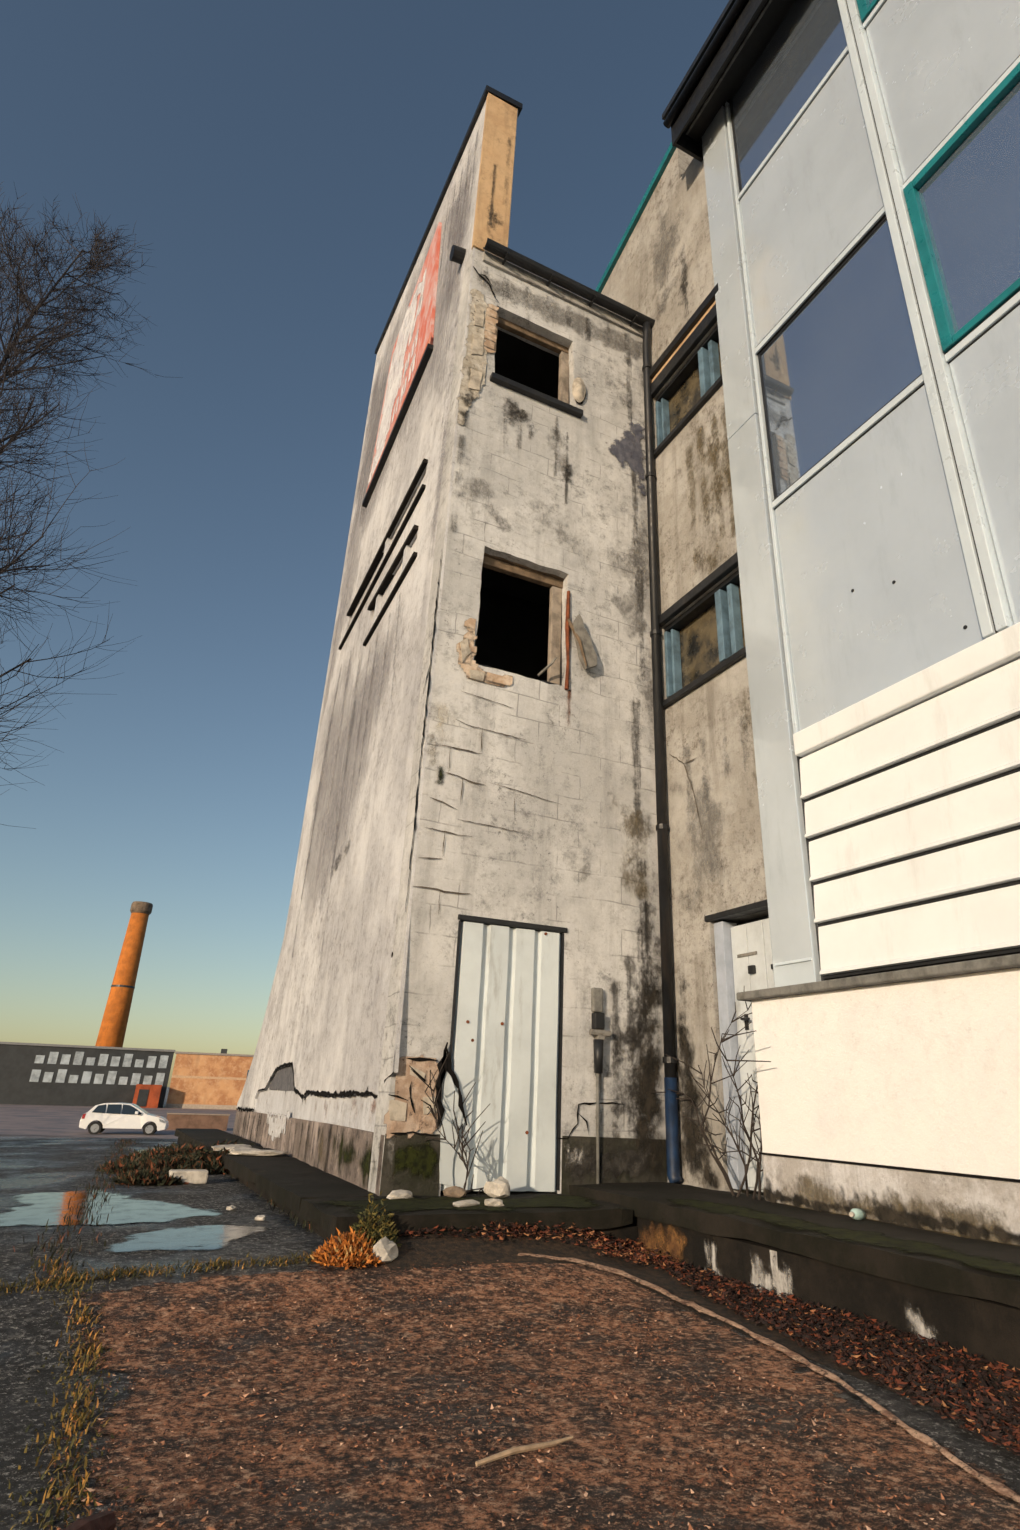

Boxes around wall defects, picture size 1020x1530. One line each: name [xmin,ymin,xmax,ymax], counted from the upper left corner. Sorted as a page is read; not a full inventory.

spalling [457,289,499,425]
leakage [686,405,735,536]
leakage [614,471,649,635]
spalling [456,618,513,687]
leakage [625,656,653,842]
spalling [269,1066,295,1093]
crack [236,1042,448,1136]
spalling [384,1055,442,1138]
leakage [563,858,718,1189]
leakage [766,1176,1020,1246]